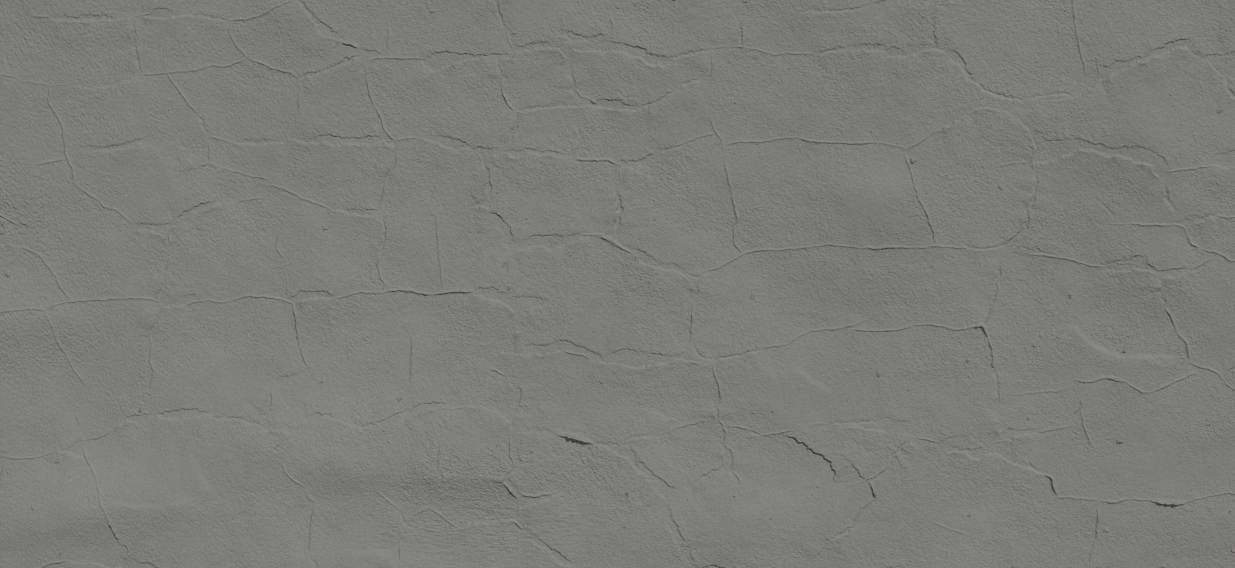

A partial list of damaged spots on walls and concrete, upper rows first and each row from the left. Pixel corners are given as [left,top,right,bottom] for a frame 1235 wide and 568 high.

crack [0,0,1235,419]
crack [37,556,160,568]
crack [374,490,577,568]
crack [624,439,725,568]
crack [779,434,910,561]
crack [1055,495,1147,509]